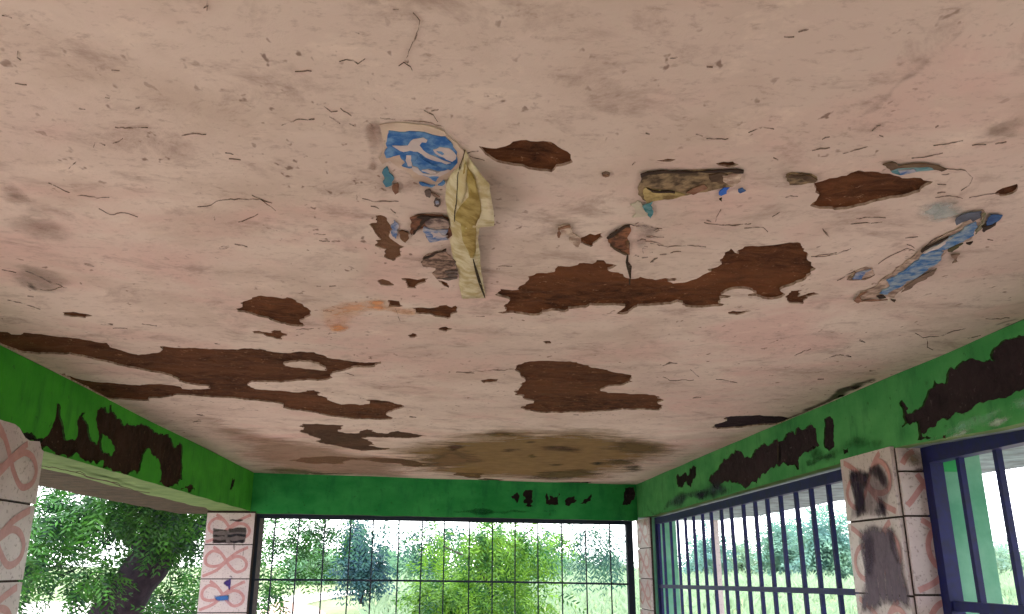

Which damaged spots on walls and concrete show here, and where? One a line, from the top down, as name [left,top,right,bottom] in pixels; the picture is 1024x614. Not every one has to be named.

spalling [479,140,572,172]
spalling [810,169,933,210]
spalling [369,149,817,332]
spalling [0,296,424,493]
spalling [514,361,663,413]
spalling [899,335,1024,440]
leakage [229,431,670,480]
spalling [709,415,848,489]
leakage [849,466,885,516]
leakage [860,526,909,611]